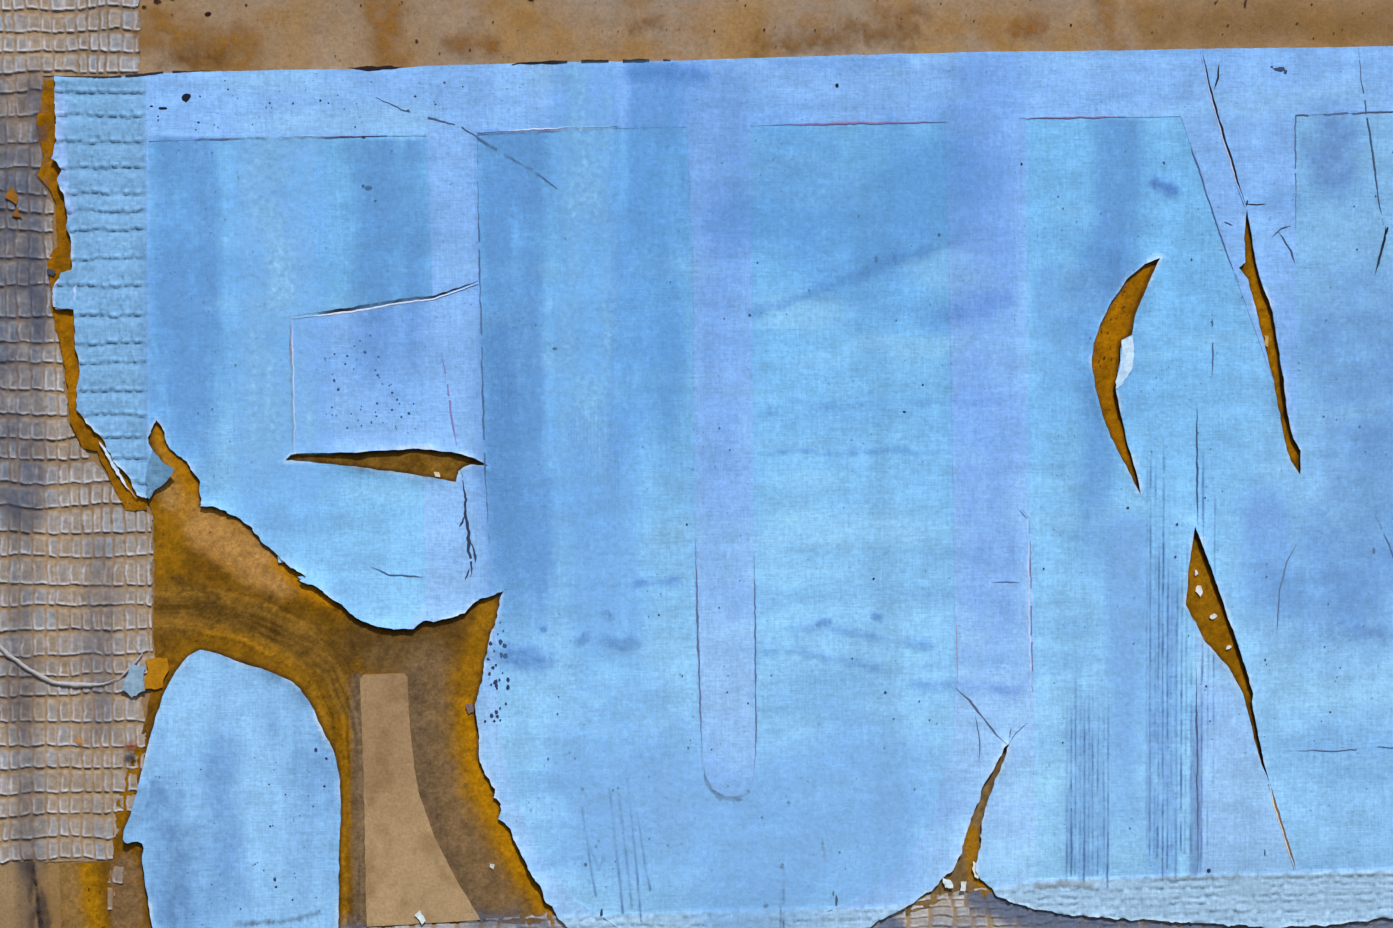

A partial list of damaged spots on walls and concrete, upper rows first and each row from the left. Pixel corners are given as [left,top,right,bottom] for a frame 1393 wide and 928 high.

peeling [5,187,22,218]
crack [158,65,612,579]
peeling [1089,258,1160,492]
peeling [1239,213,1300,474]
crack [1191,56,1393,277]
peeling [36,80,557,928]
peeling [1174,528,1268,777]
peeling [901,744,1009,915]